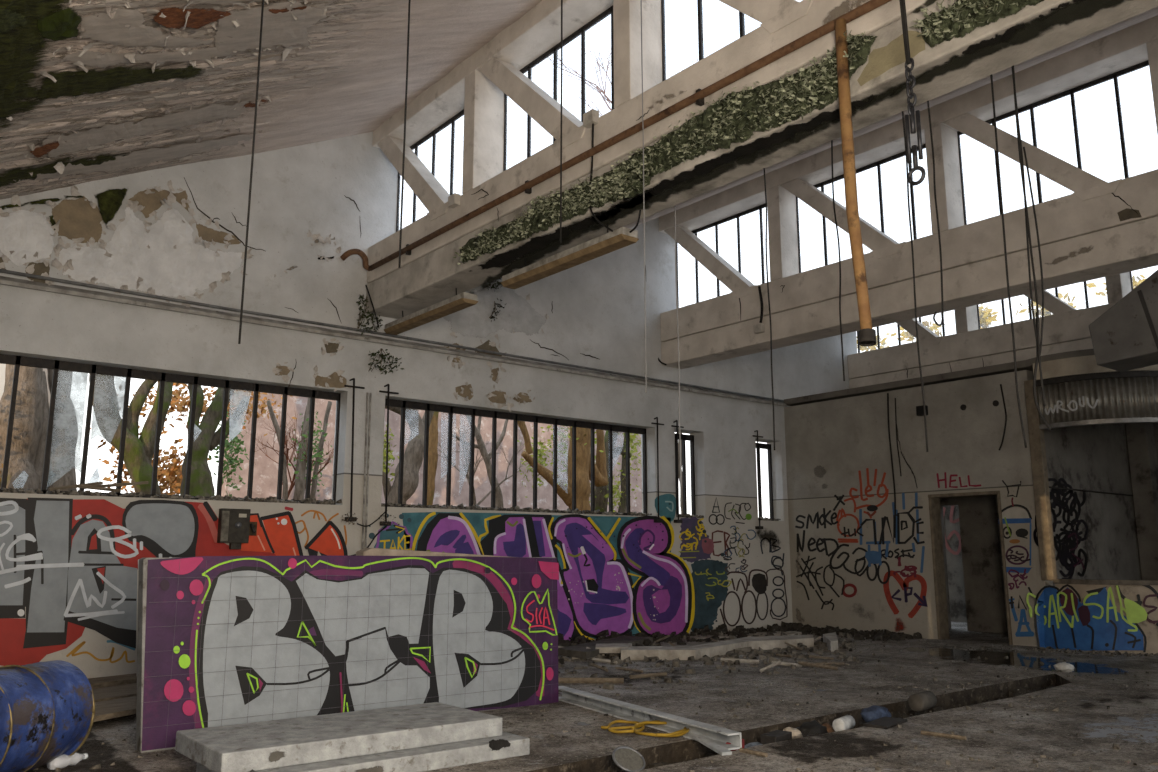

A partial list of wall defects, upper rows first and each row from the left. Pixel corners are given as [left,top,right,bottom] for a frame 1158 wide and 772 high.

peeling [53,0,339,73]
peeling [25,256,55,285]
peeling [313,338,352,392]
peeling [444,340,535,412]